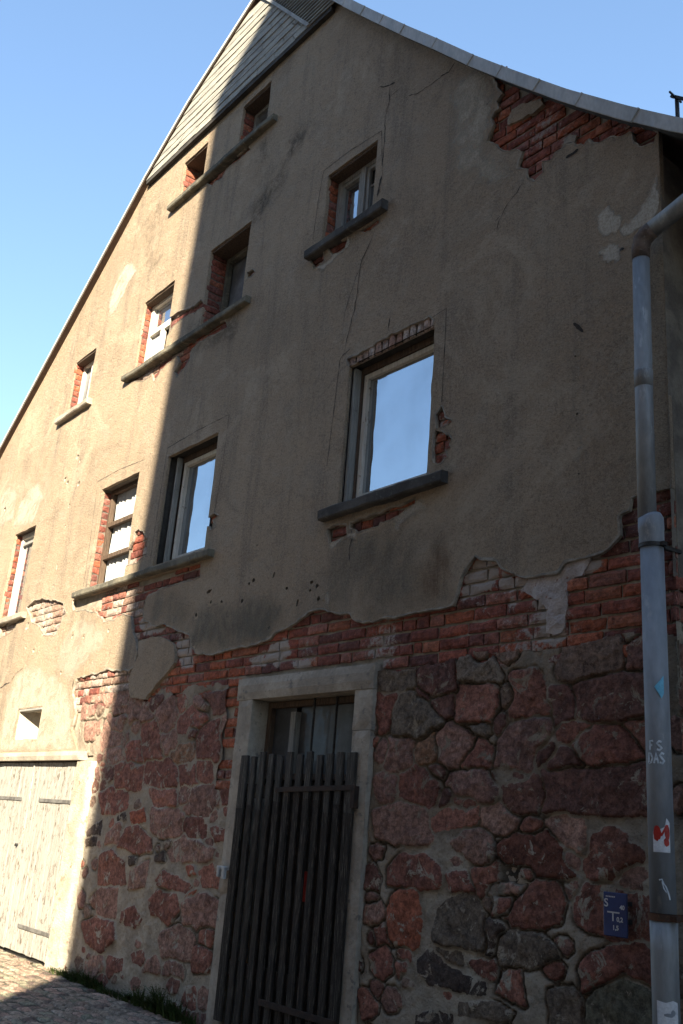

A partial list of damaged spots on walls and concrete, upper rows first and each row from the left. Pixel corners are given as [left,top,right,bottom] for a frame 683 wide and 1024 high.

crack [377,64,454,196]
flaking render [485,77,657,182]
flaking render [126,292,228,385]
flaking render [432,405,454,465]
flaking render [0,495,642,730]
flaking render [656,490,680,636]